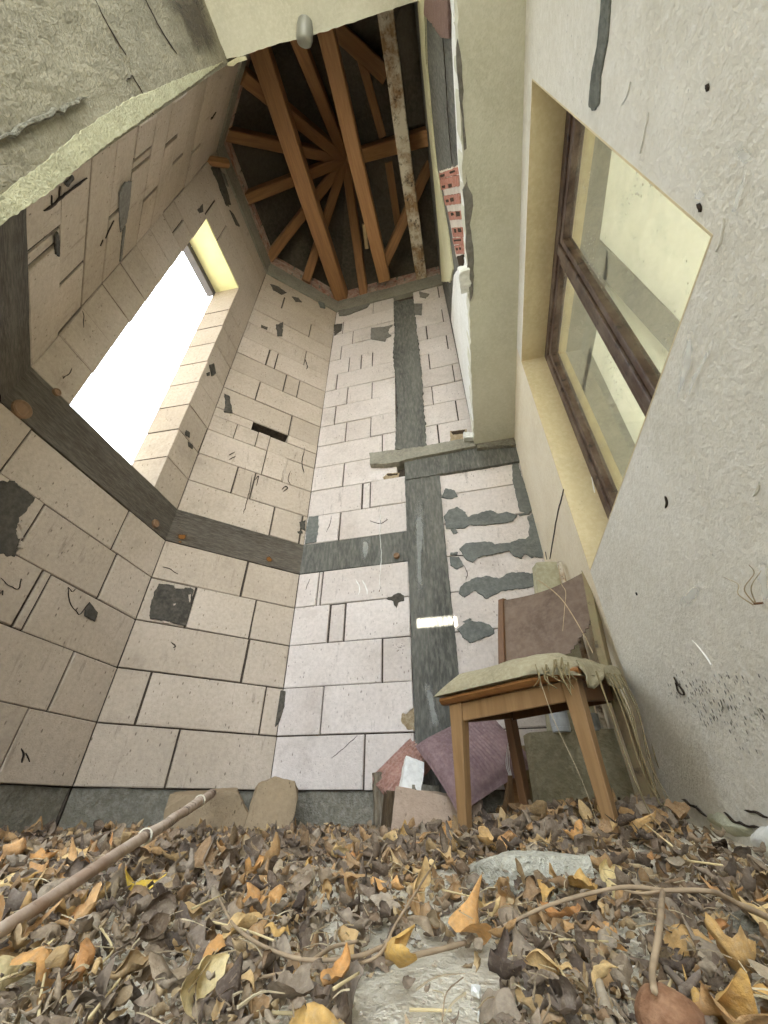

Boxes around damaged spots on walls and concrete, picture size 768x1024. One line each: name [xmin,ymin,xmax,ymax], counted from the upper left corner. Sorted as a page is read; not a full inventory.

damp [668,663,765,753]